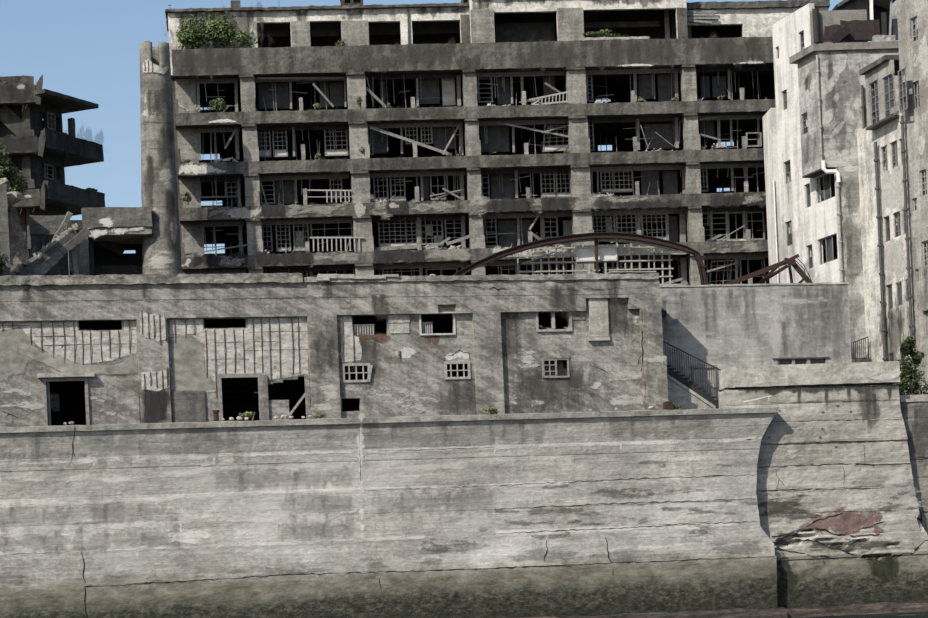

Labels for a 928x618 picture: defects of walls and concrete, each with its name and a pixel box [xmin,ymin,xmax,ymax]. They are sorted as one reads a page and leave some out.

spalling [0,310,309,398]
peeling [445,350,469,360]
peeling [1,387,44,410]
crack [17,400,928,618]
spalling [758,491,820,547]
spalling [810,534,901,550]